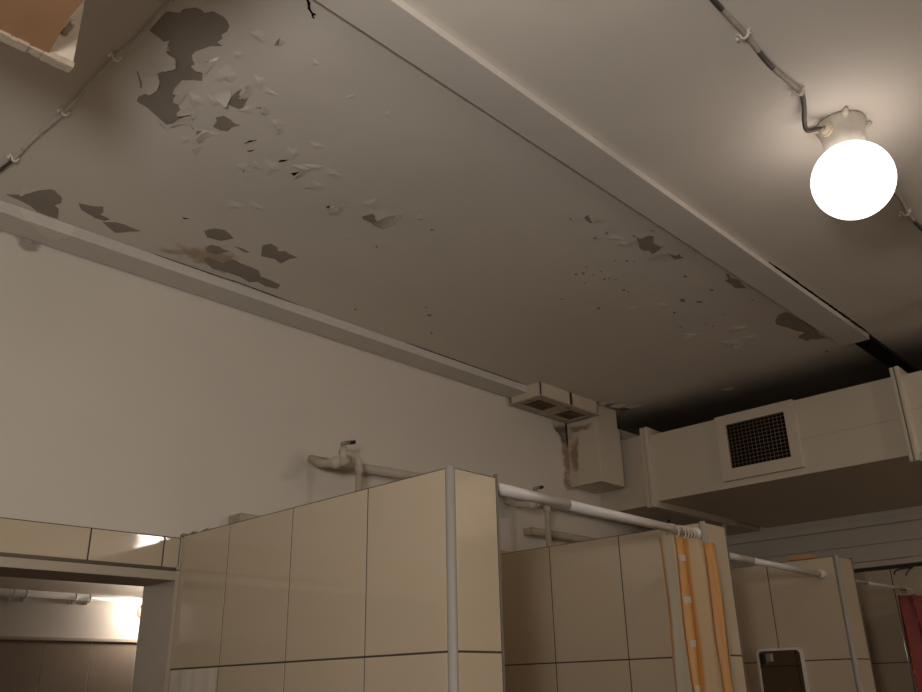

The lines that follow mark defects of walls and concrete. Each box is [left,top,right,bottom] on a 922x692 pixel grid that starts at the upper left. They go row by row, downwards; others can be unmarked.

peeling [137,7,279,155]
peeling [6,184,74,240]
peeling [79,203,139,233]
peeling [204,228,280,289]
peeling [261,244,298,264]
peeling [584,215,684,280]
peeling [775,312,826,341]
water stain [555,423,568,445]